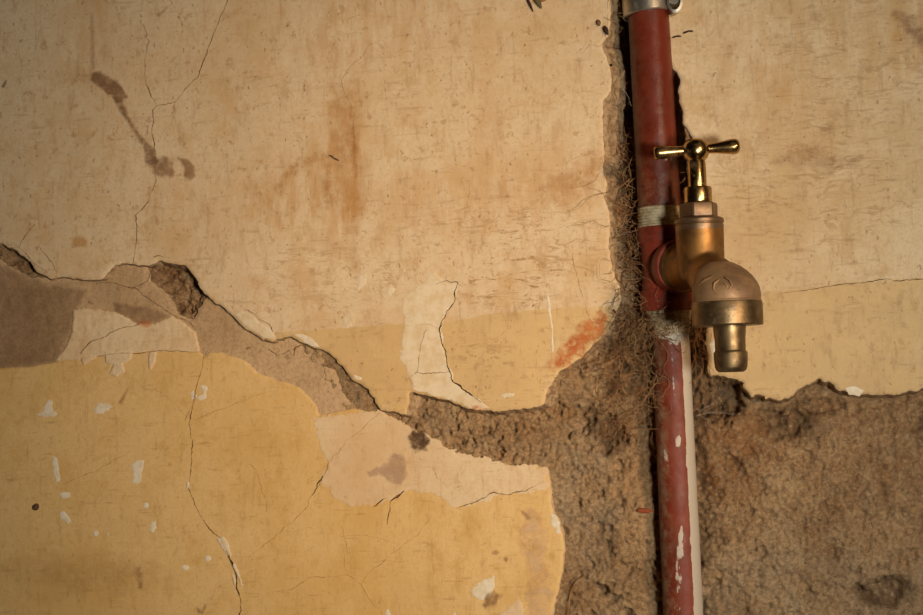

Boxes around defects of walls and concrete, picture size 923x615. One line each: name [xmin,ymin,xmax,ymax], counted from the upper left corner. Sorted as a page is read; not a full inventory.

water stain [92,73,173,175]
crack [143,0,228,152]
water stain [181,159,194,176]
crack [97,182,196,329]
crack [415,280,481,402]
rust [557,312,607,365]
crack [185,374,265,615]
spalling [0,247,663,615]
spalling [689,317,923,615]